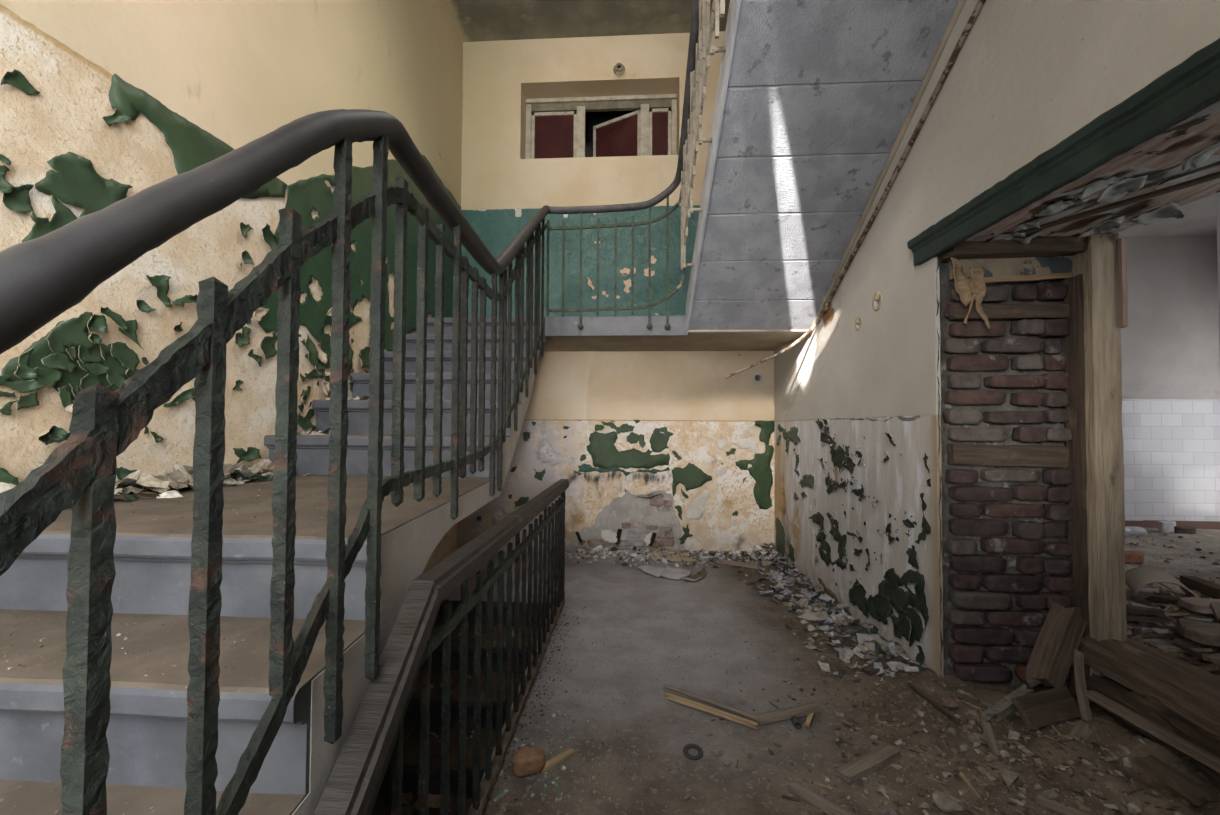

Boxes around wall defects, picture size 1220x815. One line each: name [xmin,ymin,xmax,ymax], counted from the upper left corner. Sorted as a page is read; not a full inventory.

peeling [0,69,41,95]
peeling [102,74,234,174]
peeling [0,151,132,243]
peeling [237,222,279,270]
peeling [242,174,335,229]
peeling [348,159,454,393]
peeling [0,274,198,415]
peeling [234,291,279,367]
peeling [297,245,333,431]
peeling [0,468,19,486]
peeling [35,425,70,464]
flaking render [565,255,1074,692]